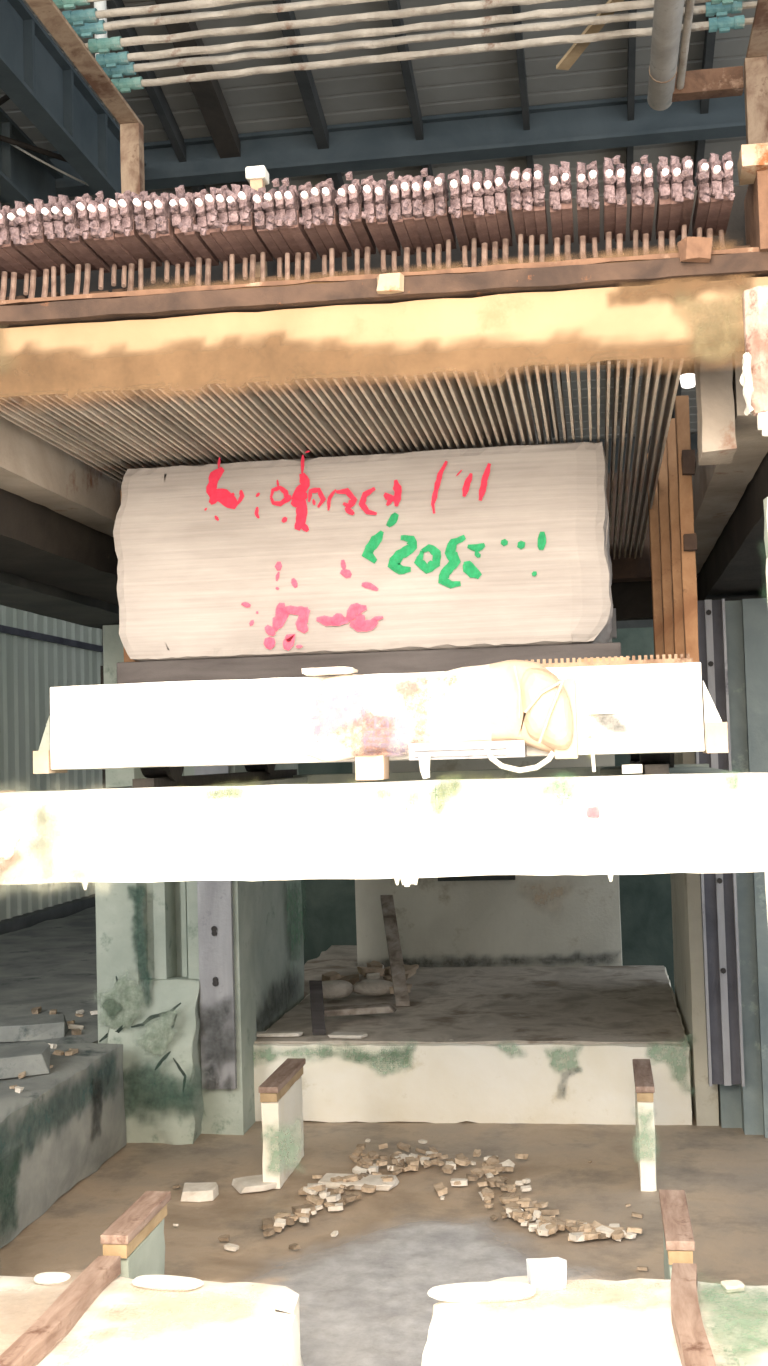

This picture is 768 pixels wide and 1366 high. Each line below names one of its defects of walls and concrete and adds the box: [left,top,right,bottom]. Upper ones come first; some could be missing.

water stain [253,1046,413,1074]
water stain [549,1050,579,1096]
water stain [0,1002,234,1233]